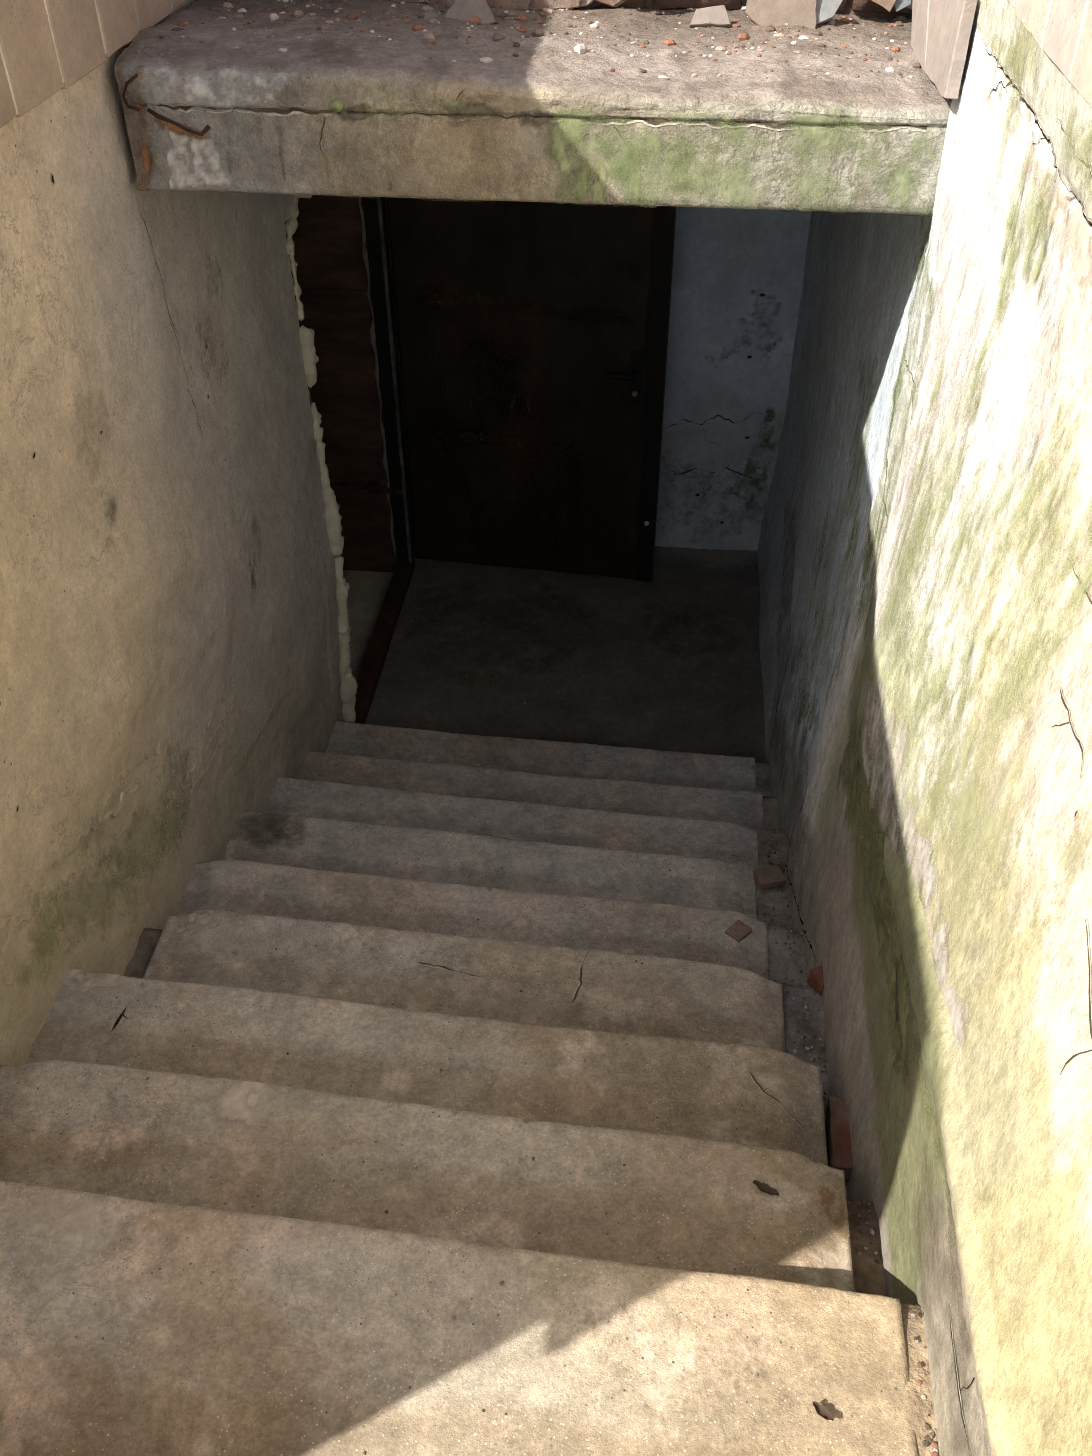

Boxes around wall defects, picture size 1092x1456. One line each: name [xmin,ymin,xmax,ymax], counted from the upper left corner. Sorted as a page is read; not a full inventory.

crack [982,36,1092,226]
crack [665,412,766,486]
crack [1067,554,1092,604]
crack [1051,688,1084,778]
crack [1060,919,1092,1074]